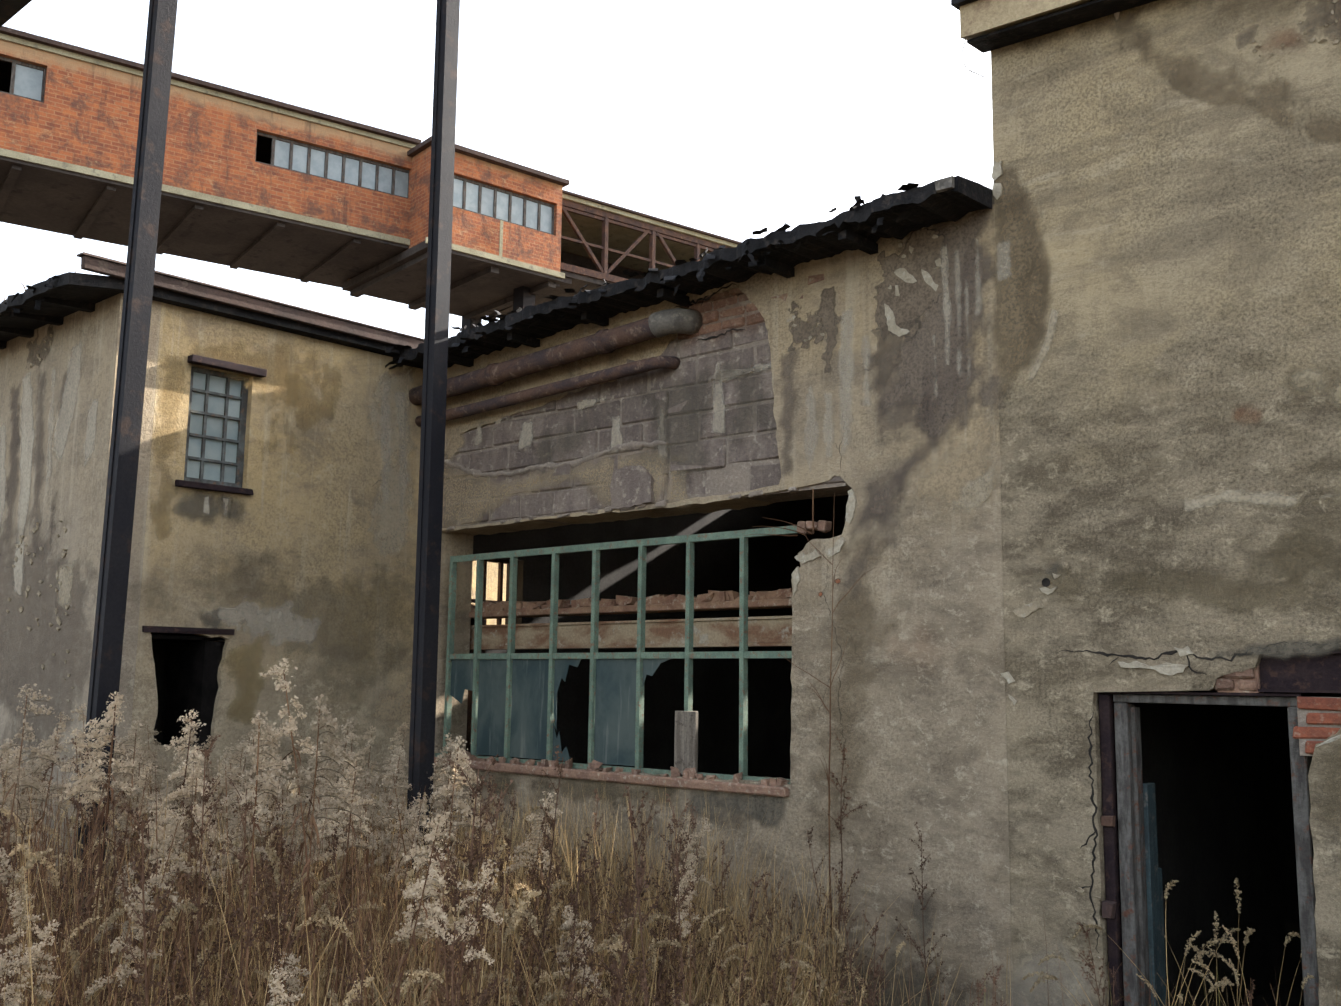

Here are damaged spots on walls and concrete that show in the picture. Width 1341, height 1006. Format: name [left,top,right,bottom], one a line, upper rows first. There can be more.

water stain [1090,12,1291,124]
flaking render [874,228,951,382]
water stain [859,171,1057,525]
water stain [0,343,97,549]
flaking render [442,274,857,596]
crack [1057,638,1341,676]
flaking render [1215,666,1264,693]
flaking render [1293,696,1341,756]